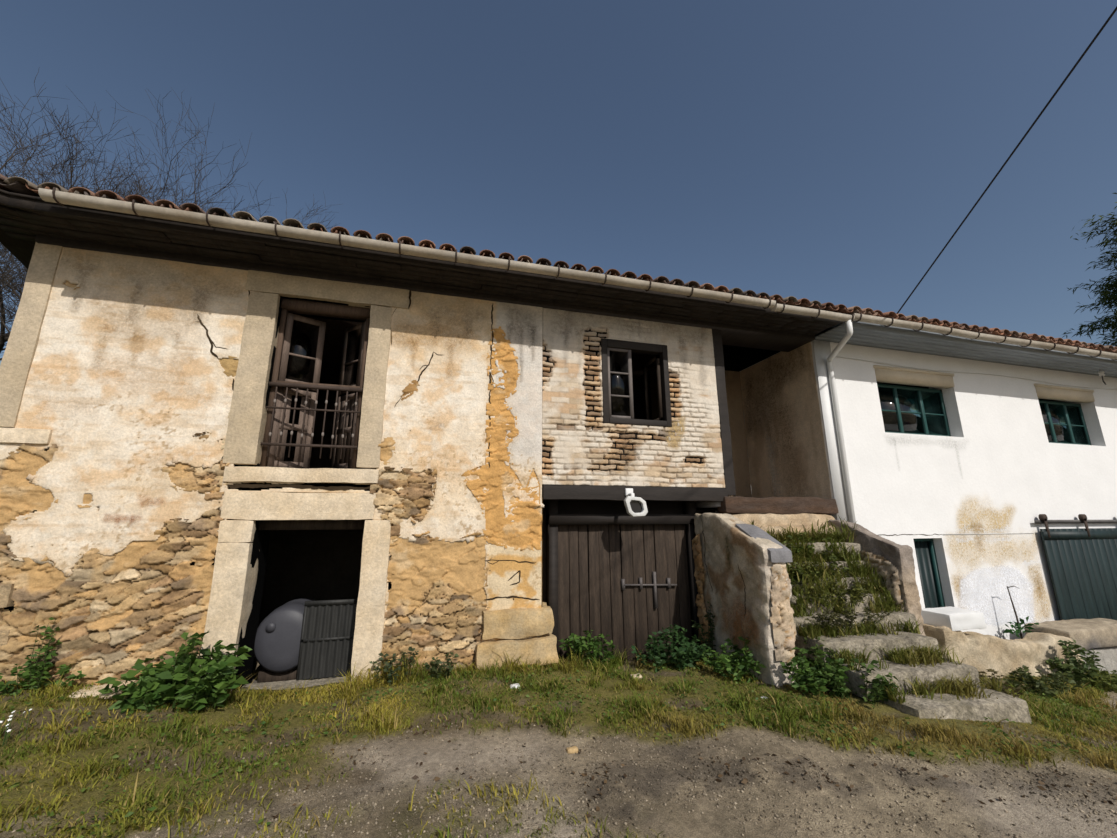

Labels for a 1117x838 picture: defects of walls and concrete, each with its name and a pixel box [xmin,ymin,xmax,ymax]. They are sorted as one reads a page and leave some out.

crack [196,314,235,390]
crack [395,352,439,406]
spalling [542,340,557,391]
spalling [583,327,667,473]
spalling [669,374,682,421]
spalling [0,432,230,687]
spalling [369,326,554,675]
water stain [953,501,1048,625]